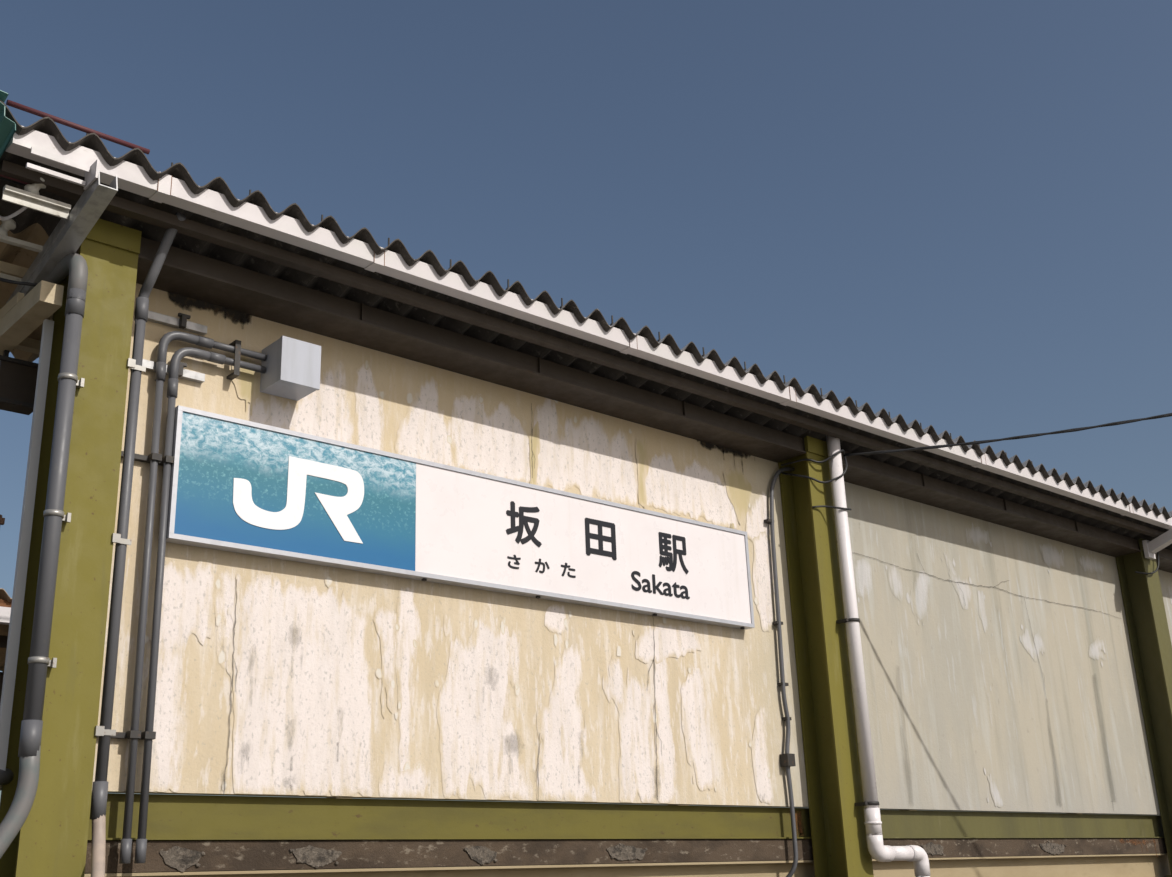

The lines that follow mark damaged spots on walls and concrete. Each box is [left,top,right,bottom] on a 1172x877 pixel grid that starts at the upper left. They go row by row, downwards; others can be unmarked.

peeling [248,359,775,632]
peeling [145,559,428,798]
peeling [435,603,598,802]
peeling [602,617,718,803]
peeling [749,705,774,805]
crack [856,553,1118,694]